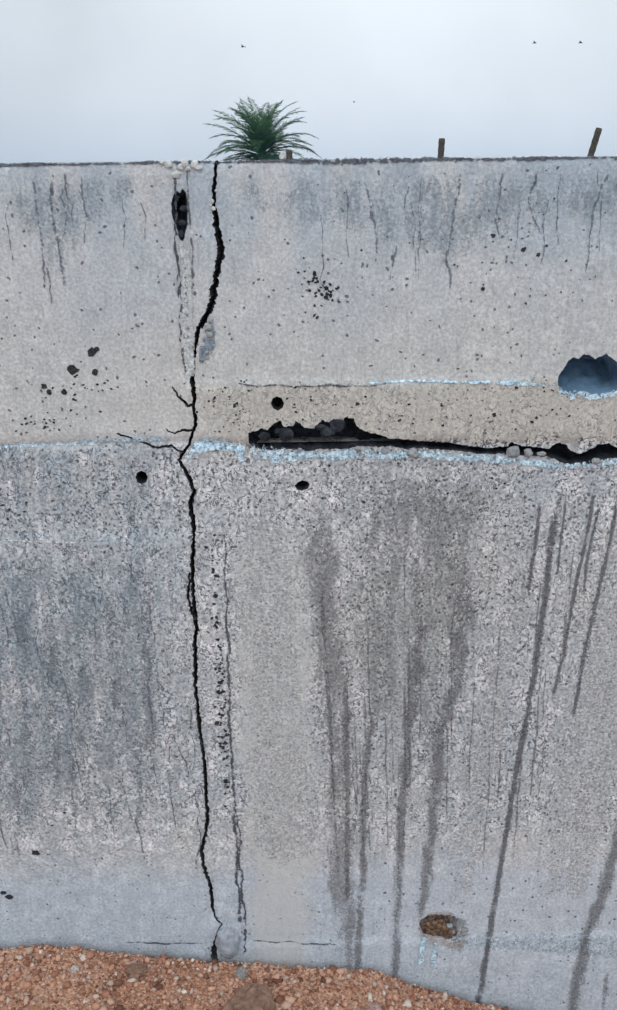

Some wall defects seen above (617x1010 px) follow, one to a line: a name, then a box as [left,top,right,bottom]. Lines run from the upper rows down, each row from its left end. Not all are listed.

water stain [0,160,211,168]
spalling [171,189,188,241]
water stain [223,156,617,165]
spalling [248,396,617,465]
crack [116,160,335,960]
water stain [145,672,209,782]
water stain [306,524,426,968]
water stain [418,585,475,915]
water stain [452,497,617,1010]